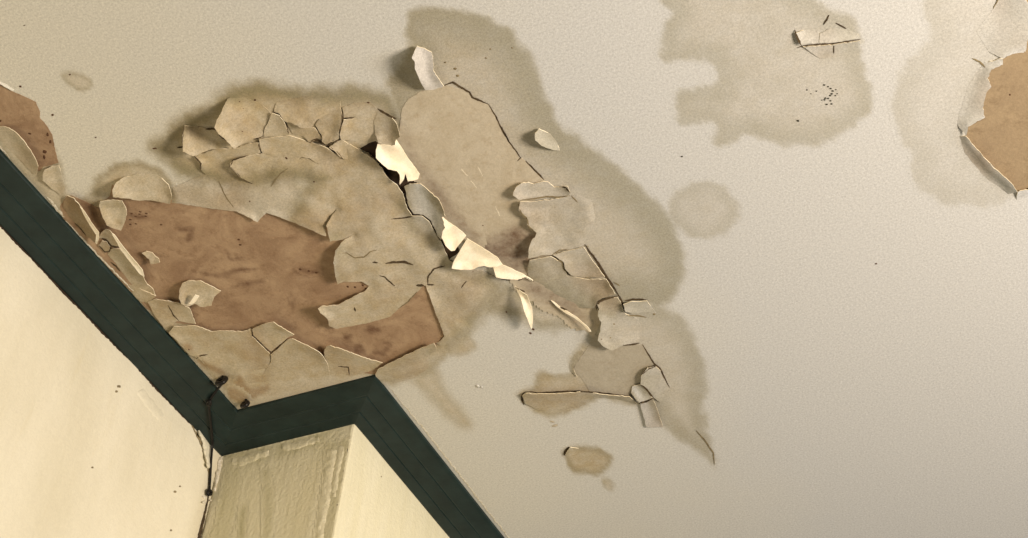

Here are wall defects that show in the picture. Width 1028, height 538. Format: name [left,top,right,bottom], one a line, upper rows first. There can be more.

peeling [795,15,861,59]
leakage [653,0,1023,214]
peeling [958,0,1028,200]
peeling [0,46,672,428]
leakage [0,1,747,473]
spalling [197,430,223,503]
crack [521,390,637,416]
leakage [560,441,619,493]